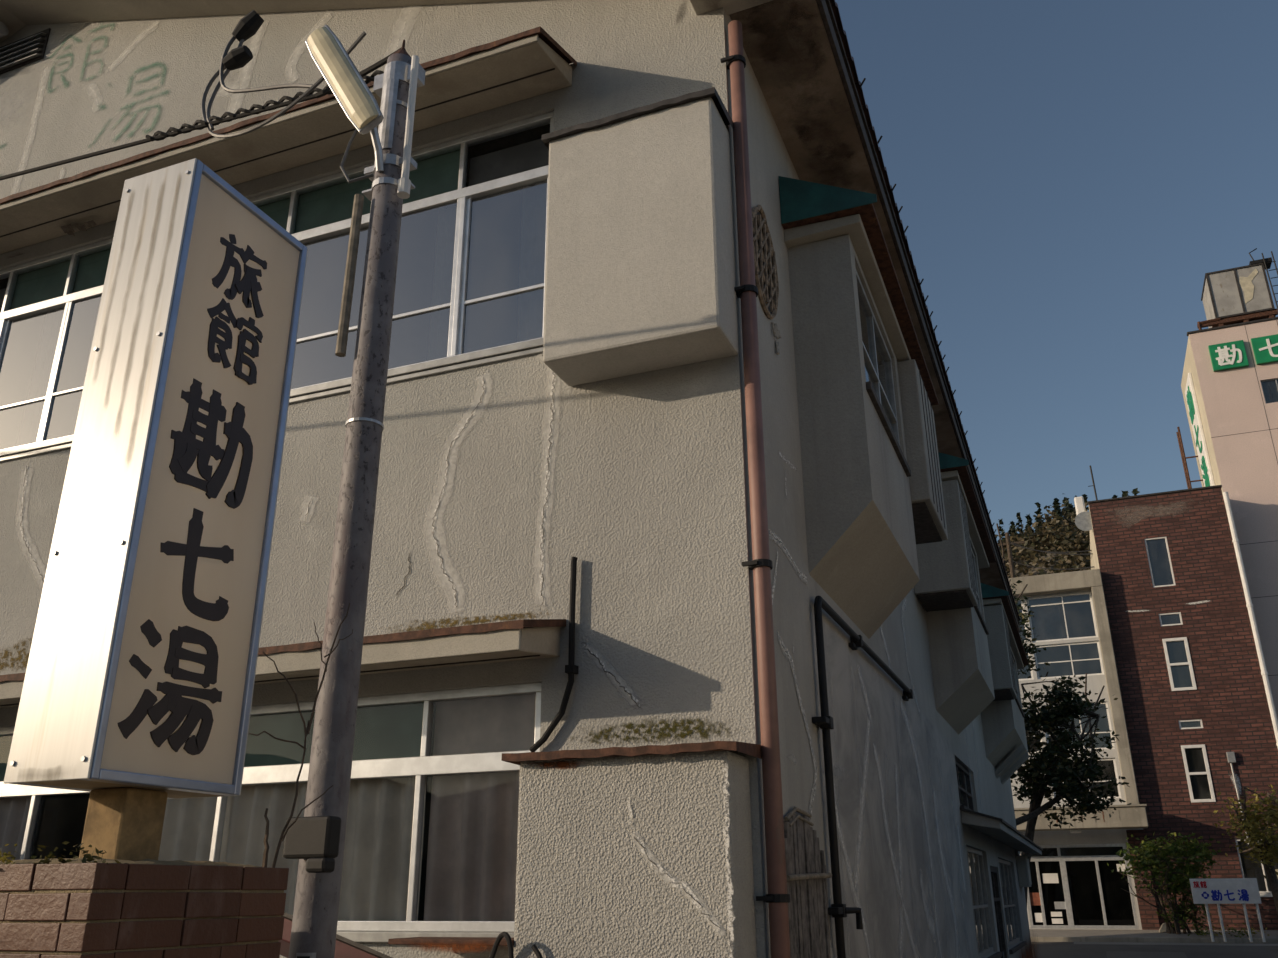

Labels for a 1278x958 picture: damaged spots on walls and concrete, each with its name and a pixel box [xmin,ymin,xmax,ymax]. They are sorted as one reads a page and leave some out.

crack [17,466,46,589]
crack [397,375,492,613]
crack [535,353,559,605]
crack [769,531,966,958]
crack [627,801,724,937]